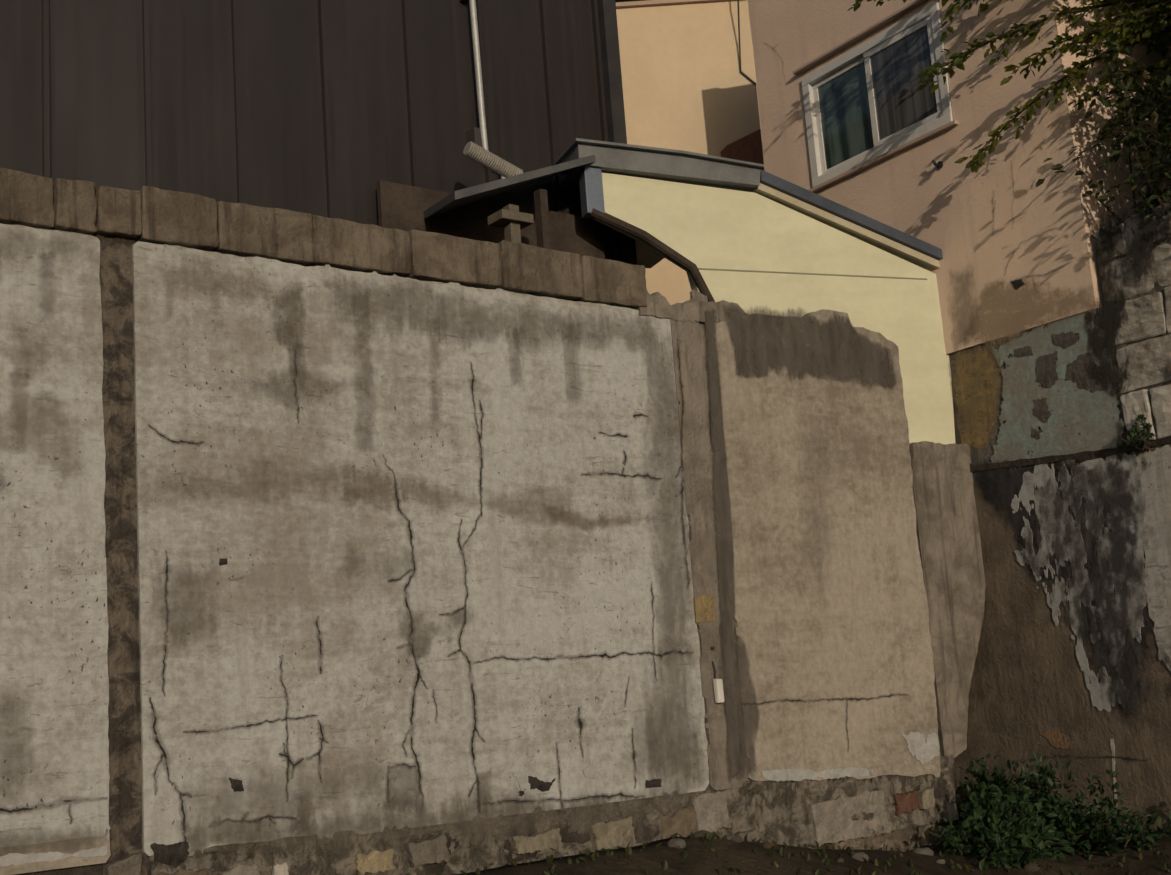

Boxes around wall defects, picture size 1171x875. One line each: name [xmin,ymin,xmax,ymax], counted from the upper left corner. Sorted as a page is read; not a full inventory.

leakage [967,280,1097,343]
crack [149,425,202,444]
peeling [990,308,1171,712]
crack [385,341,693,814]
crack [149,552,328,853]
crack [741,694,906,750]
crack [0,799,89,822]